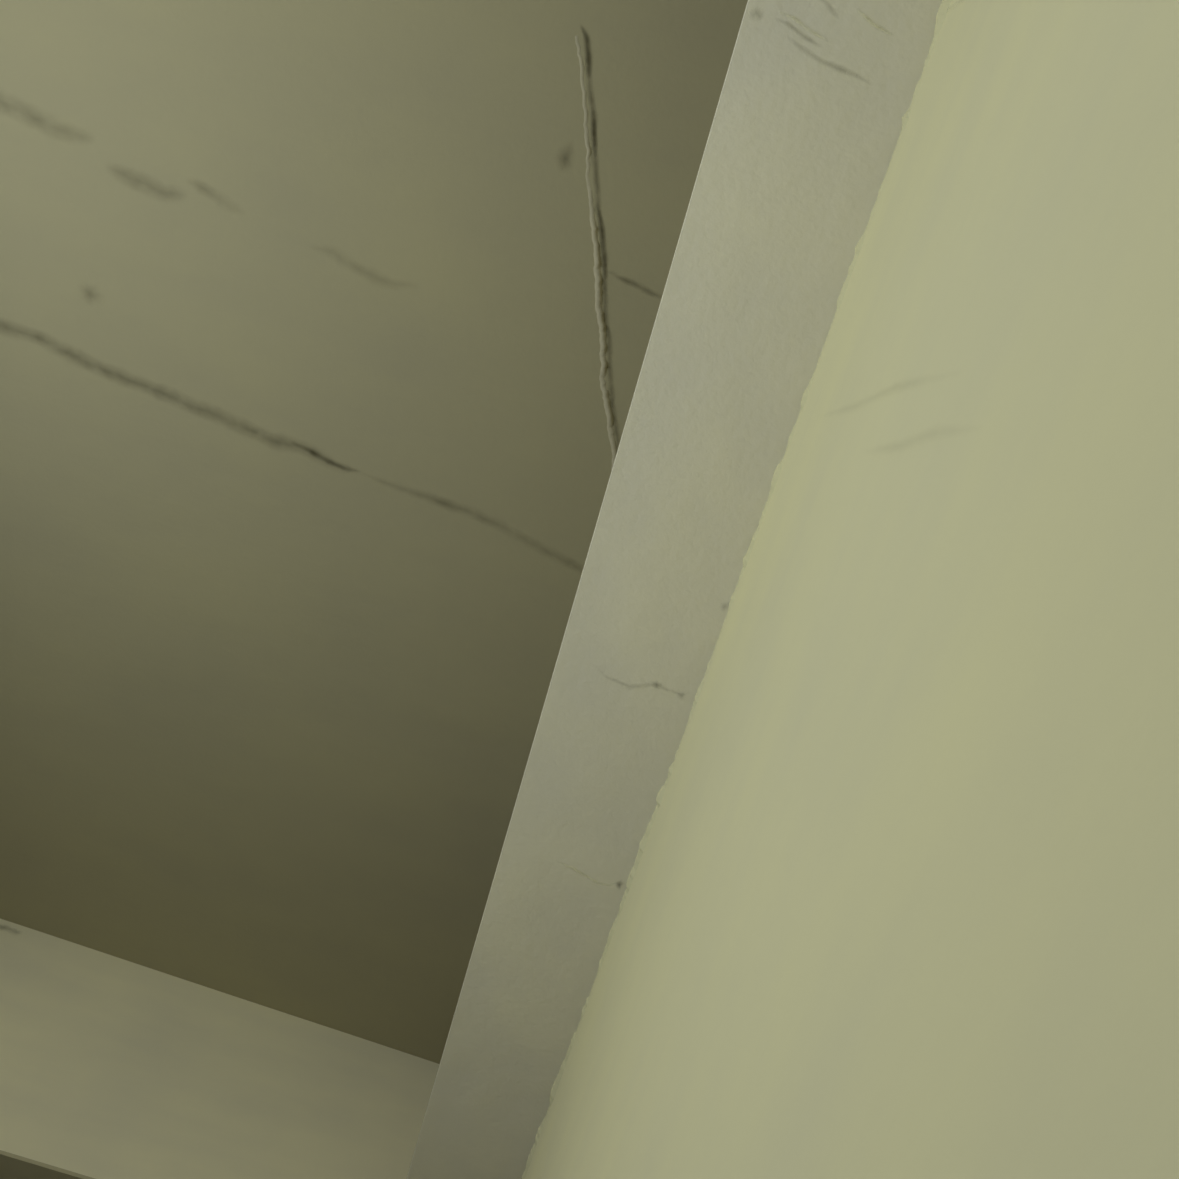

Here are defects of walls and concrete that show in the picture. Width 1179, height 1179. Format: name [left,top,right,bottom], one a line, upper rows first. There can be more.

crack [575,35,617,471]